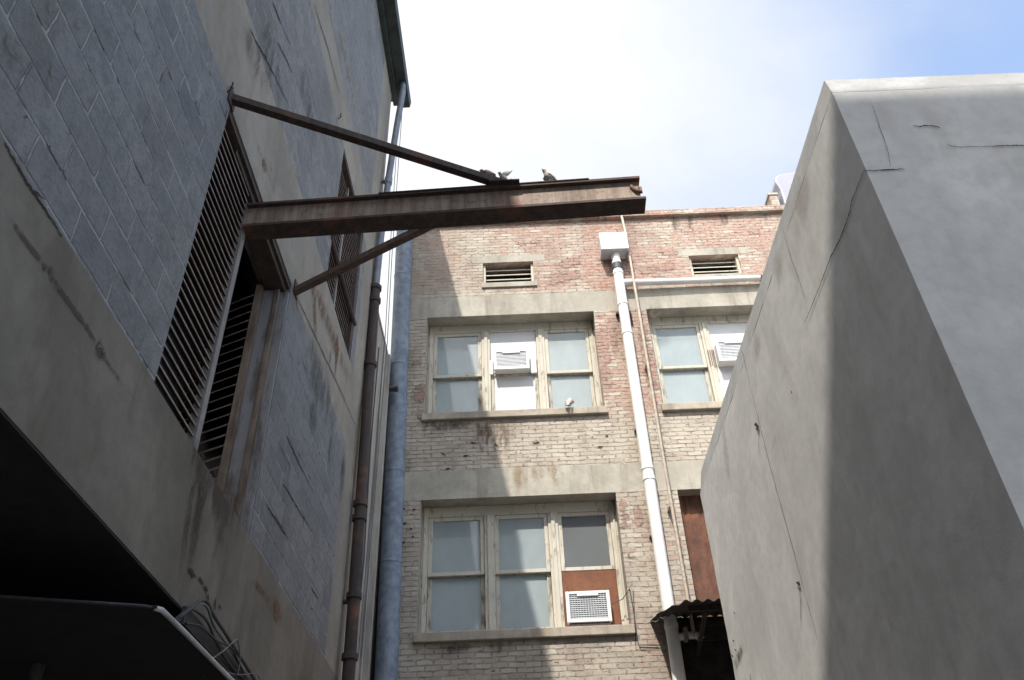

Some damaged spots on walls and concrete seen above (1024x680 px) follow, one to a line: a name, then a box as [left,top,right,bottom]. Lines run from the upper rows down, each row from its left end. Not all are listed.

crack [783,106,898,322]
crack [913,125,1024,147]